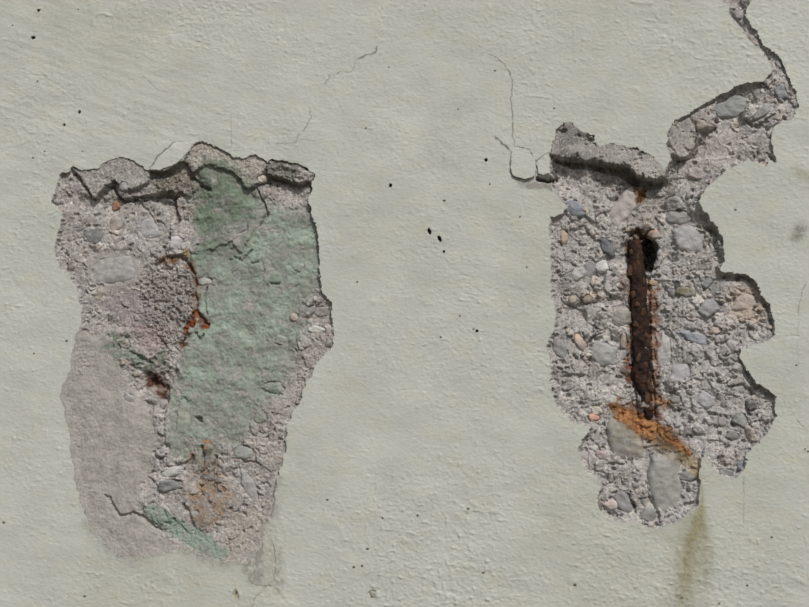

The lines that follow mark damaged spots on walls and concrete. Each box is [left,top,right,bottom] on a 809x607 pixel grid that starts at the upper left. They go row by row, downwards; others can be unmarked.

spalling [723,0,752,11]
rust [158,249,198,286]
spalling [52,141,334,584]
rust [180,309,210,348]
rust [608,294,691,456]
spalling [510,71,799,529]